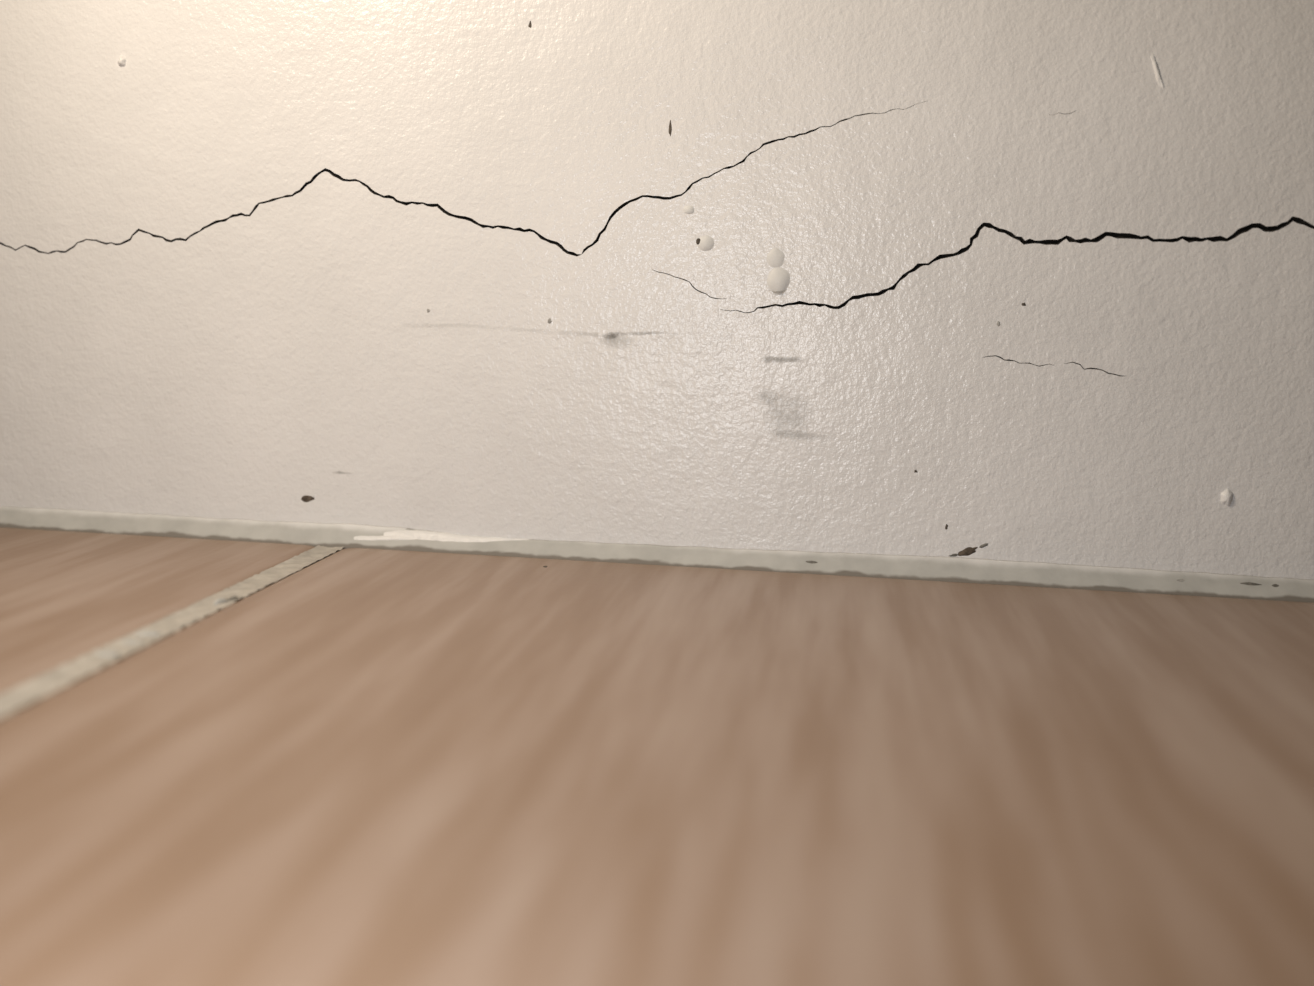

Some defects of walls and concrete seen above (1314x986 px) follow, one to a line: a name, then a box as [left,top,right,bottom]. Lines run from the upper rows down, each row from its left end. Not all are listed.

crack [0,101,926,256]
crack [652,216,1314,313]